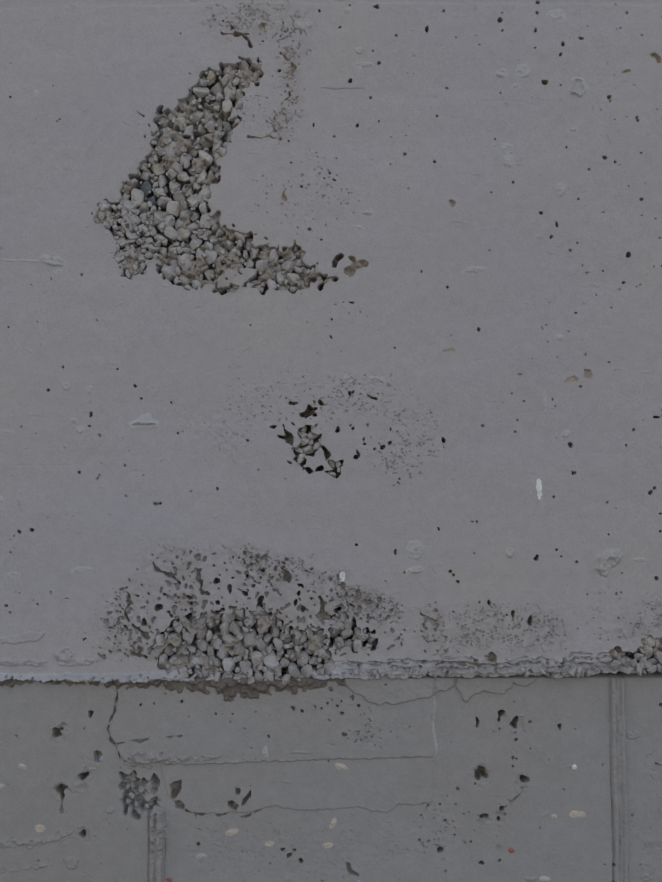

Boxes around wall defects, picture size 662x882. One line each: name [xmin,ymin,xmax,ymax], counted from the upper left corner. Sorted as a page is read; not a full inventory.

spalling [83,3,394,335]
spalling [171,350,453,500]
spalling [52,545,662,668]
spalling [48,722,71,748]
crack [106,690,182,762]
peeling [454,675,537,704]
spalling [494,710,526,737]
spalling [49,750,103,802]
crack [185,809,262,819]
peeling [108,681,508,882]
spalling [626,684,662,882]